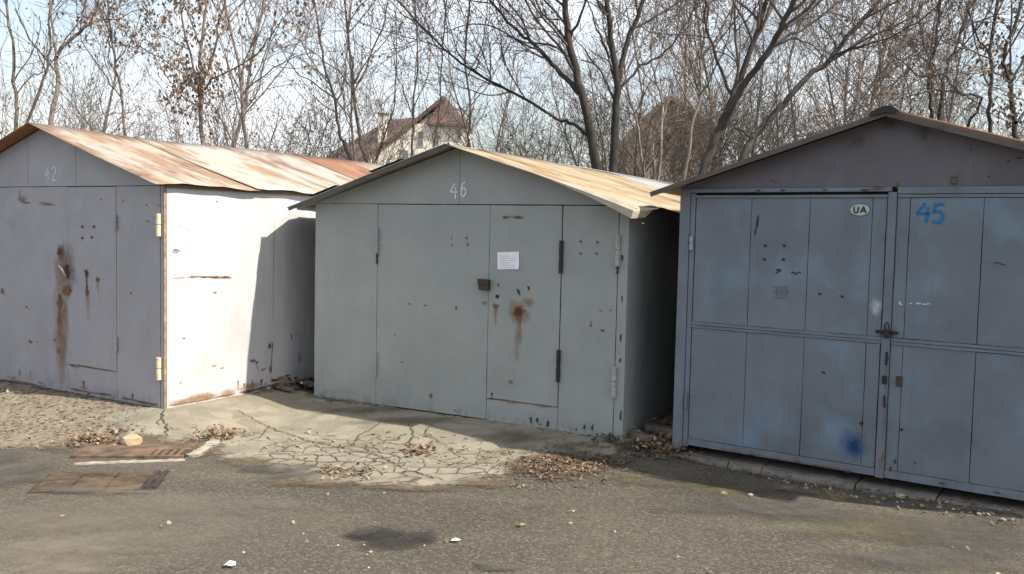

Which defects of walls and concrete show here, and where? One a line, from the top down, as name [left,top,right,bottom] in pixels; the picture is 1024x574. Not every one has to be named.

rust [54,246,72,356]
rust [512,300,531,339]
rust [173,343,273,406]
crack [239,410,511,485]